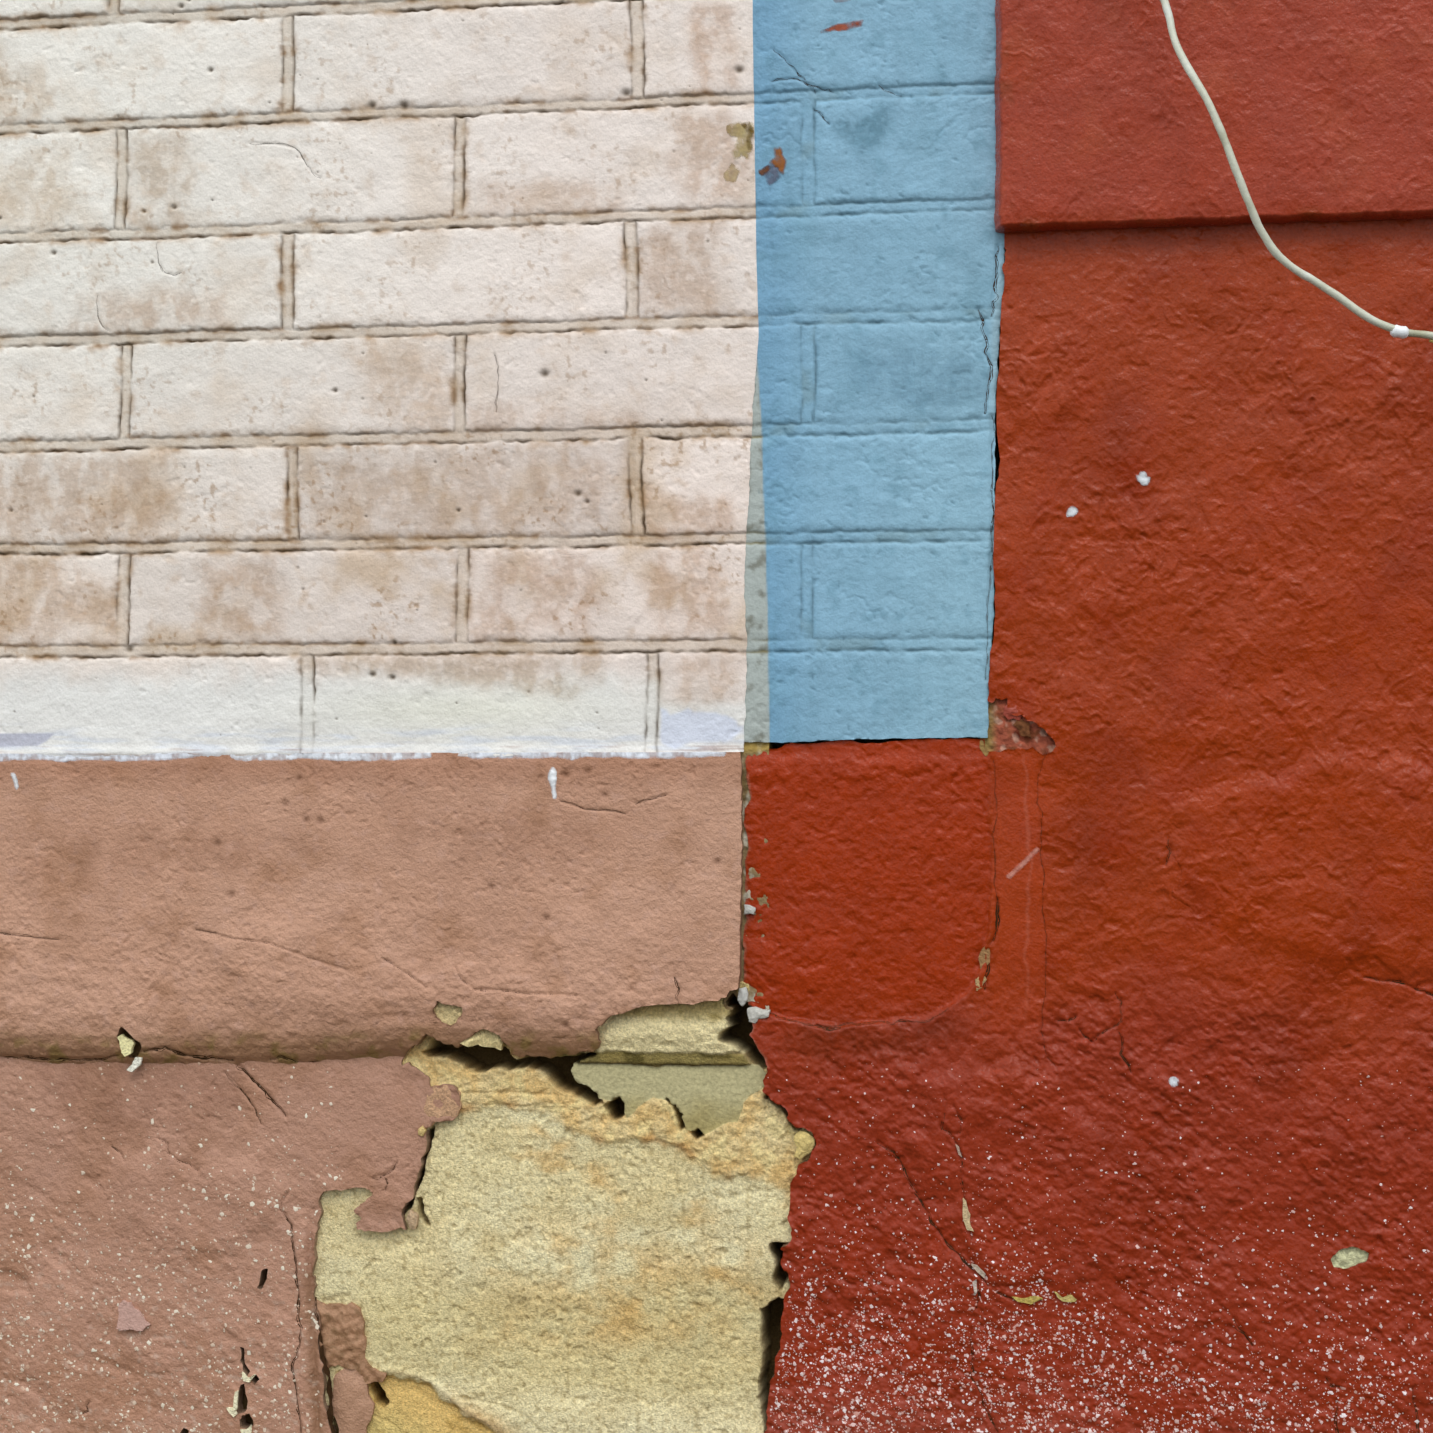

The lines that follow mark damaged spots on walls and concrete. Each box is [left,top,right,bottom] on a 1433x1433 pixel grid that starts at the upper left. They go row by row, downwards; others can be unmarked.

peeling [724,123,754,182]
peeling [759,148,786,185]
flaking render [979,699,1056,756]
flaking render [744,904,756,915]
crack [770,1010,946,1031]
peeling [117,1030,143,1072]
flaking render [314,981,816,1433]
peeling [226,1371,258,1433]